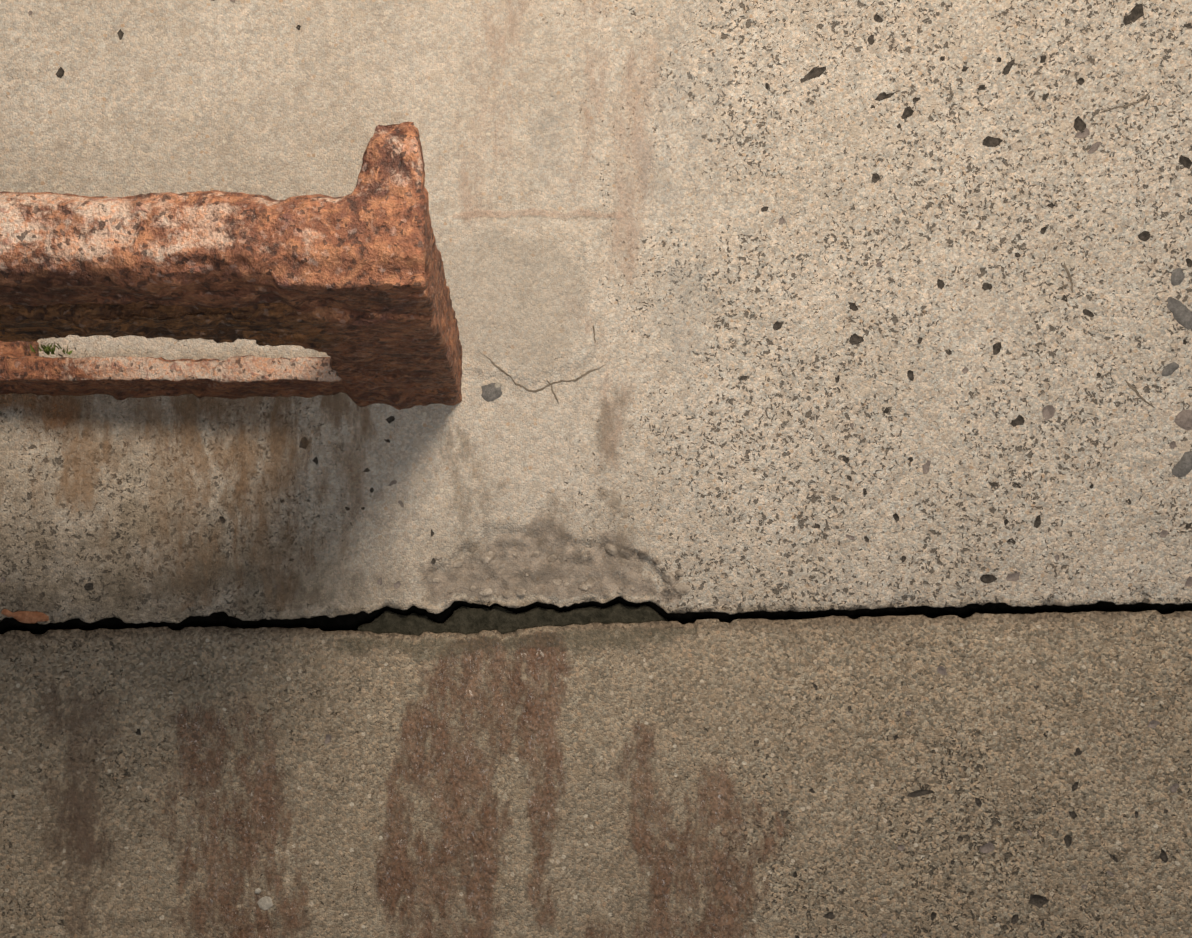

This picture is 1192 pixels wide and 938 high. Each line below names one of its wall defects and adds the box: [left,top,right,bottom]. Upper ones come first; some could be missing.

crack [0,597,1192,636]